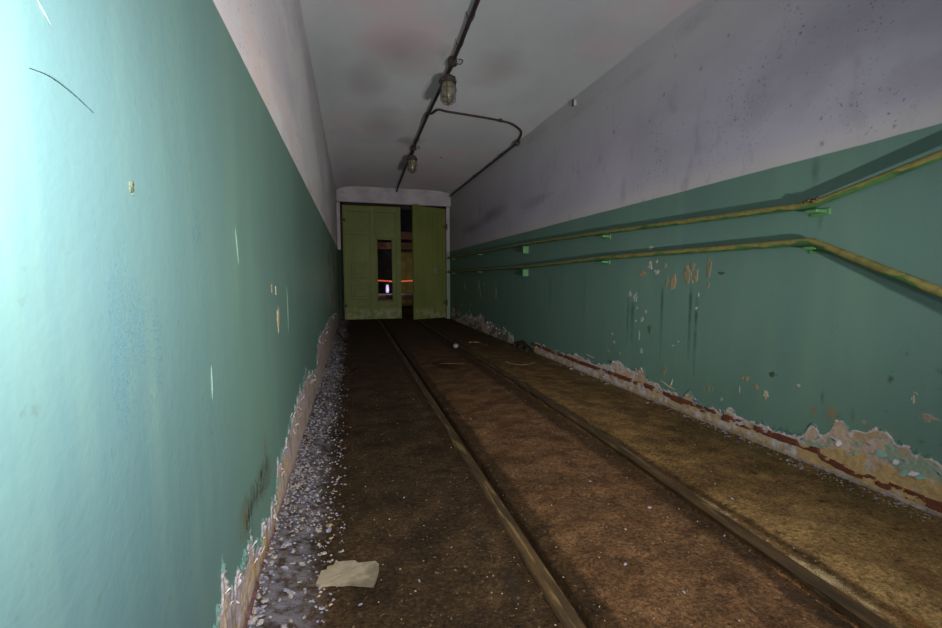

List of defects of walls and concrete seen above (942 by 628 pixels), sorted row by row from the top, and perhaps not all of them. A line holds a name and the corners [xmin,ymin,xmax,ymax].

peeling [534,332,942,518]